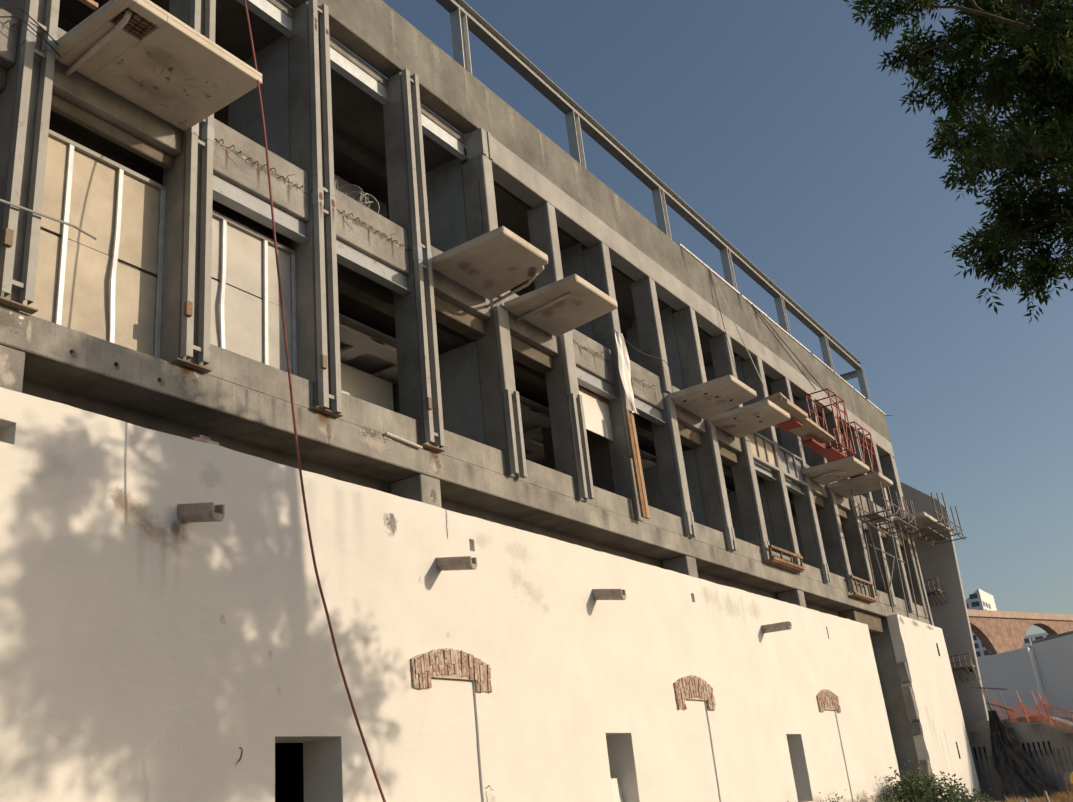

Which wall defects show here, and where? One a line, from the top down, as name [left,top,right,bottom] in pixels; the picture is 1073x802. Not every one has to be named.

peeling [384,512,396,536]